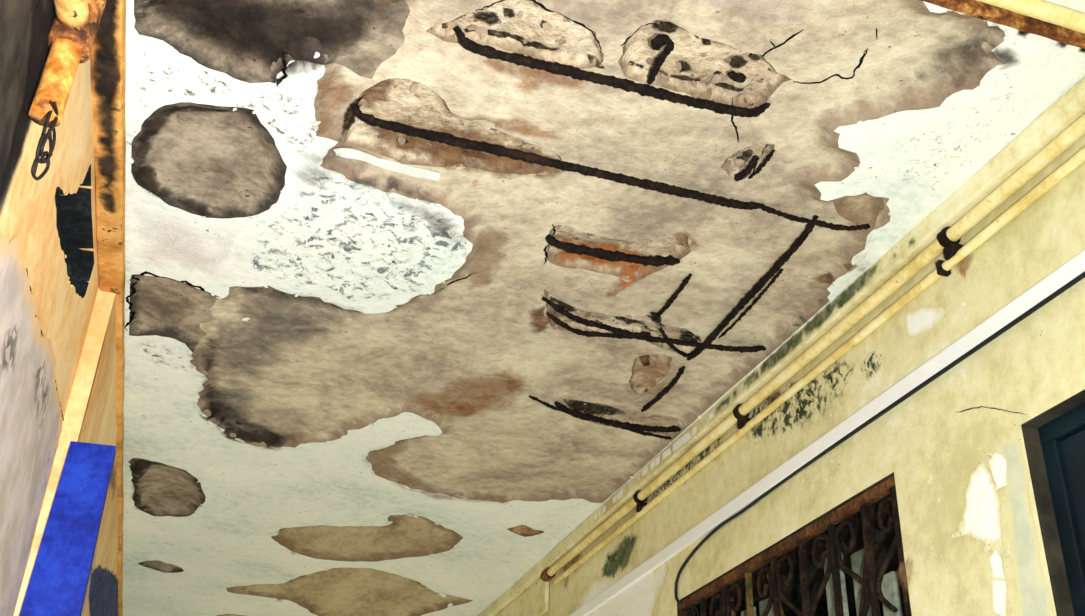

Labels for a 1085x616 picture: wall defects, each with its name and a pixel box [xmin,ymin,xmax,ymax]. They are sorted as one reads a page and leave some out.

leakage [0,0,52,201]
leakage [135,0,373,198]
crack [761,30,803,57]
crack [793,29,878,84]
spalling [55,164,96,298]
spalling [126,0,1009,520]
rust [557,239,648,296]
leakage [717,265,877,410]
leakage [751,351,881,438]
peeling [951,438,1053,616]